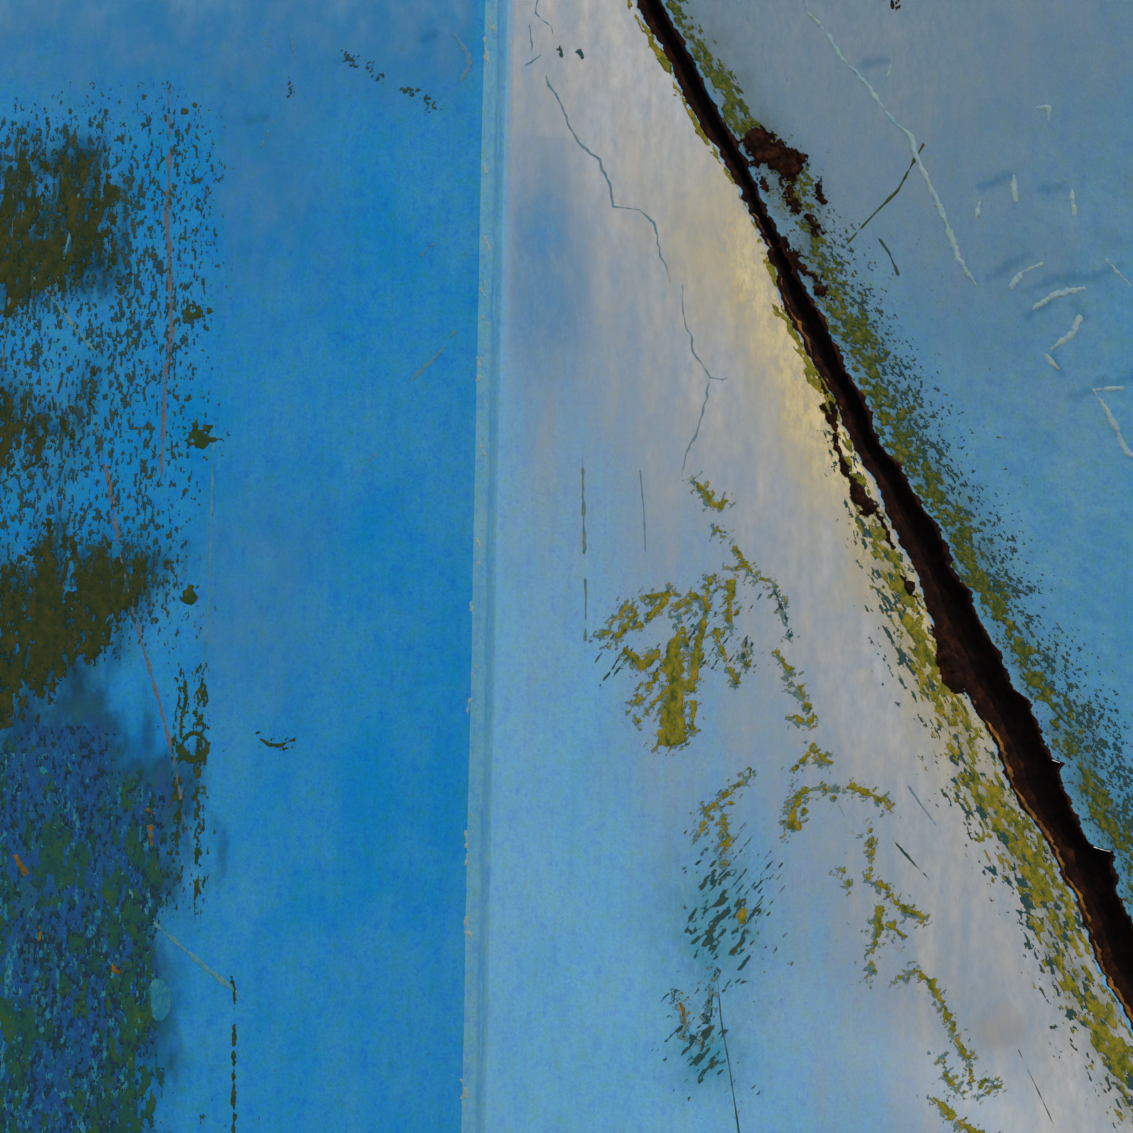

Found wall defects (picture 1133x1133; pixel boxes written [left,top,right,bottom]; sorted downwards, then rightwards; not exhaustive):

peeling [0,365,104,483]
peeling [0,123,134,338]
crack [525,0,728,472]
corrosion [737,124,828,238]
peeling [511,0,1133,1133]
crack [637,0,1133,1037]